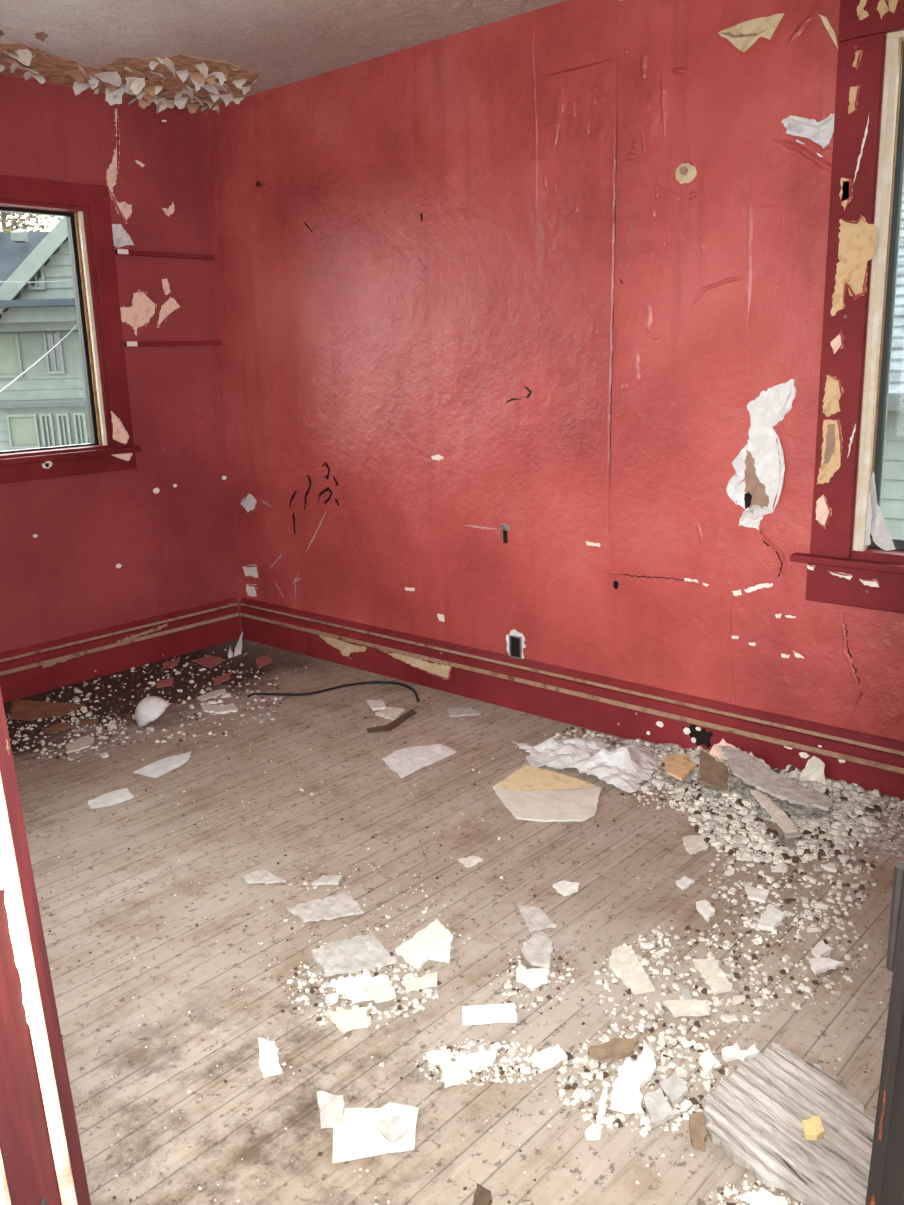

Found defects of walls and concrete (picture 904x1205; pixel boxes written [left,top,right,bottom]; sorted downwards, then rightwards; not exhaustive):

peeling [857,0,904,20]
peeling [0,30,259,250]
peeling [120,278,180,336]
peeling [831,177,877,316]
peeling [816,375,843,529]
peeling [319,635,451,680]